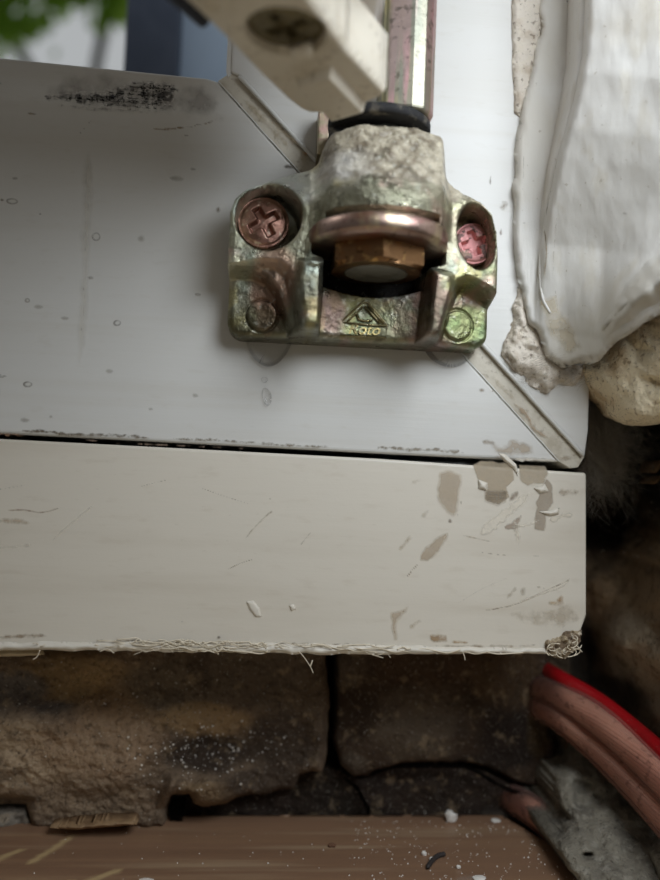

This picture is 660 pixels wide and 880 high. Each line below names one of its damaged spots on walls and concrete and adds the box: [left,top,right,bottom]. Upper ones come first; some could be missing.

peeling [498,453,518,476]